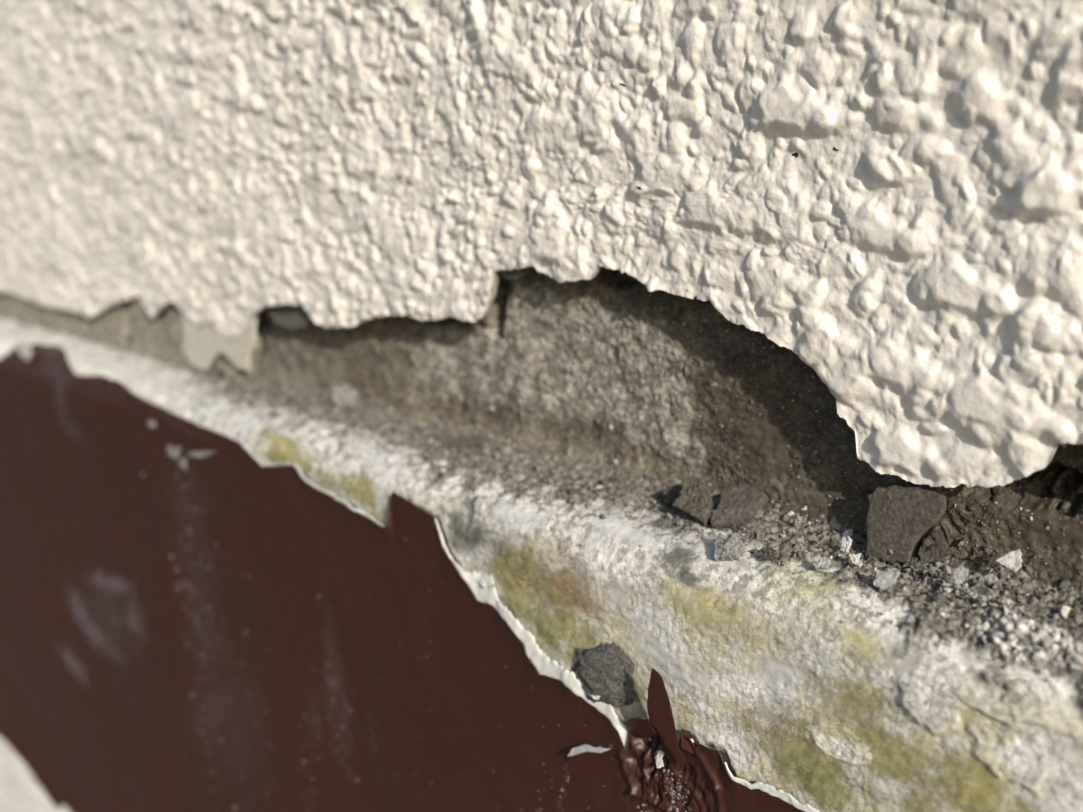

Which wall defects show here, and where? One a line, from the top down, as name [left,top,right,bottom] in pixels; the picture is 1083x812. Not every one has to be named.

leakage [235,412,312,472]
leakage [321,446,404,510]
leakage [451,498,484,551]
peeling [0,266,1083,812]
leakage [494,547,595,655]
leakage [592,513,749,625]
leakage [736,400,794,474]
leakage [1022,469,1083,549]
leakage [663,769,692,812]
leakage [762,718,849,809]
leakage [829,689,1008,812]